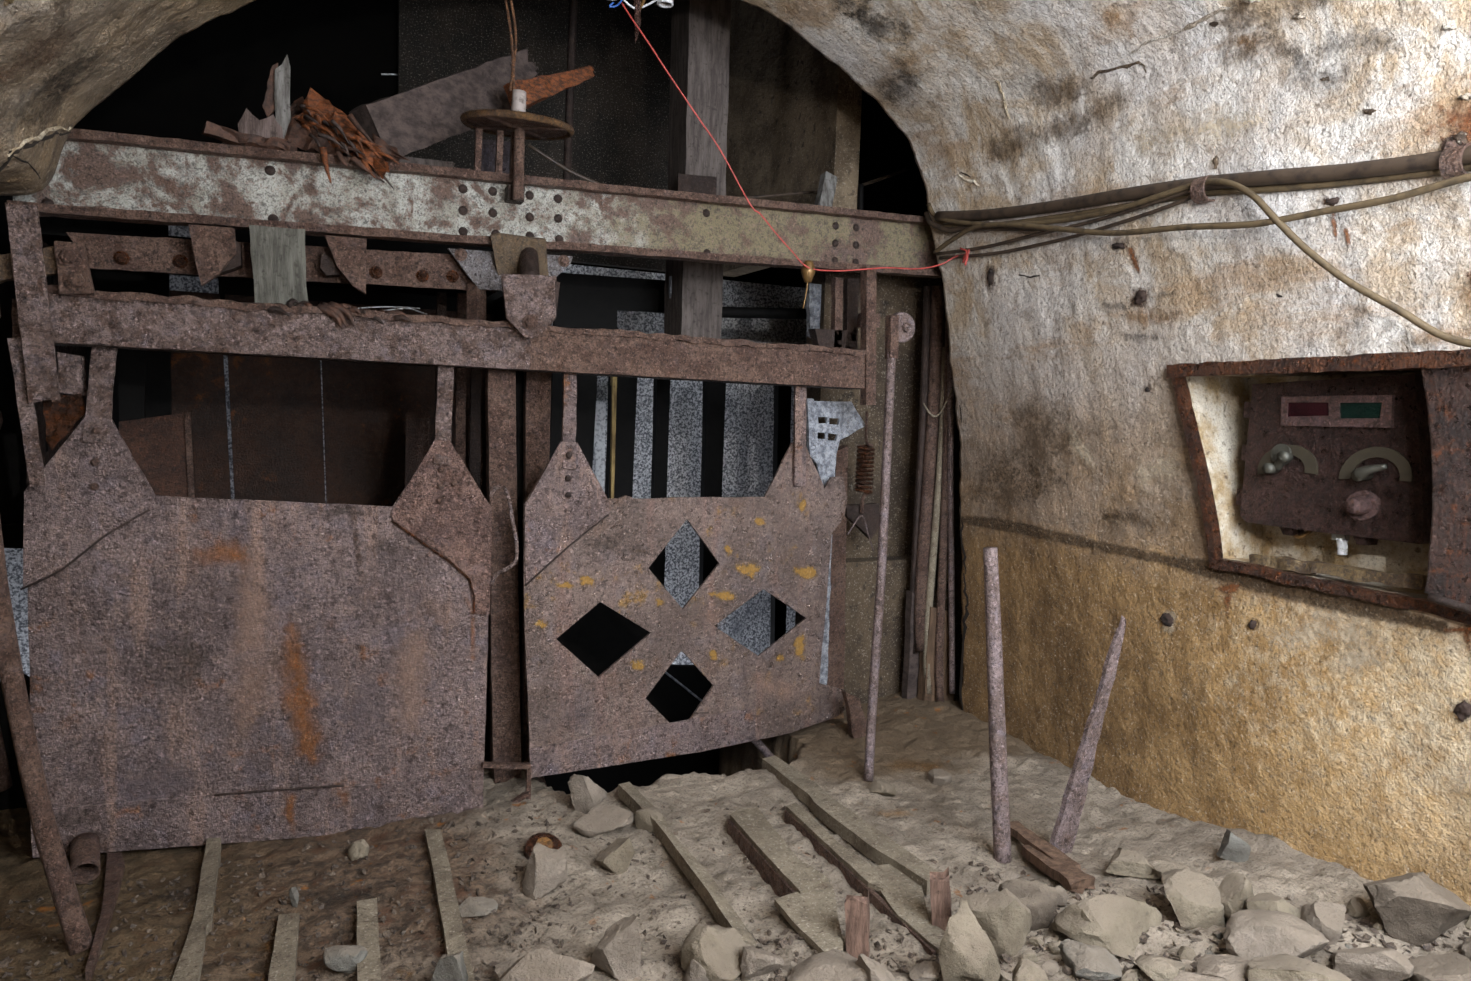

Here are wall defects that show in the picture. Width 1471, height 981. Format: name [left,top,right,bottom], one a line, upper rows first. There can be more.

leakage [1216,1,1307,86]
rust [1426,104,1471,142]
rust [1444,626,1471,651]